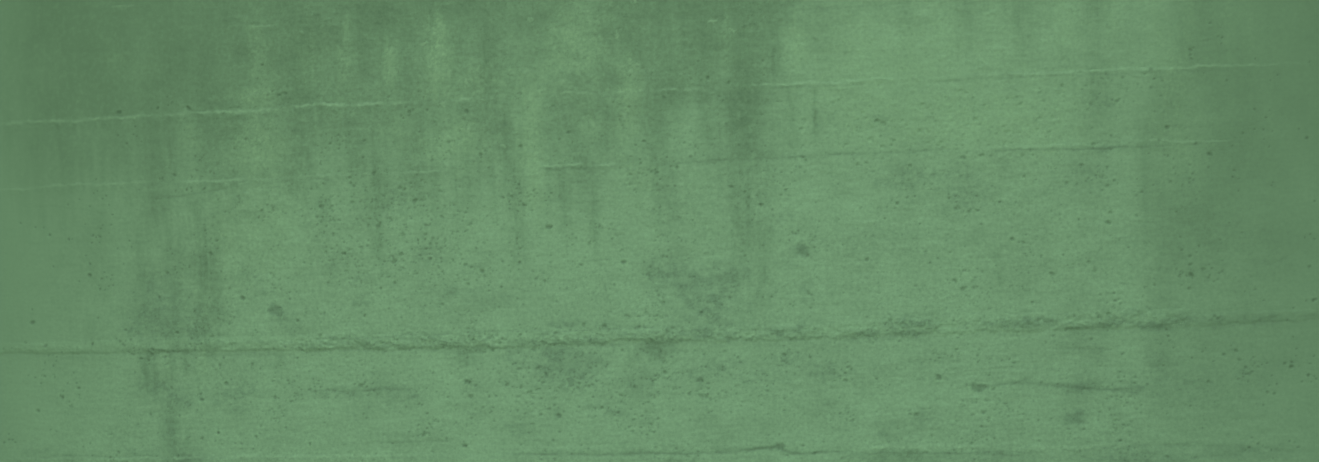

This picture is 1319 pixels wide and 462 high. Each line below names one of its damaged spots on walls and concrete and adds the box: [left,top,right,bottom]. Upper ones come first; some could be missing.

water stain [0,0,672,457]
water stain [266,0,1203,430]
water stain [857,74,1319,462]